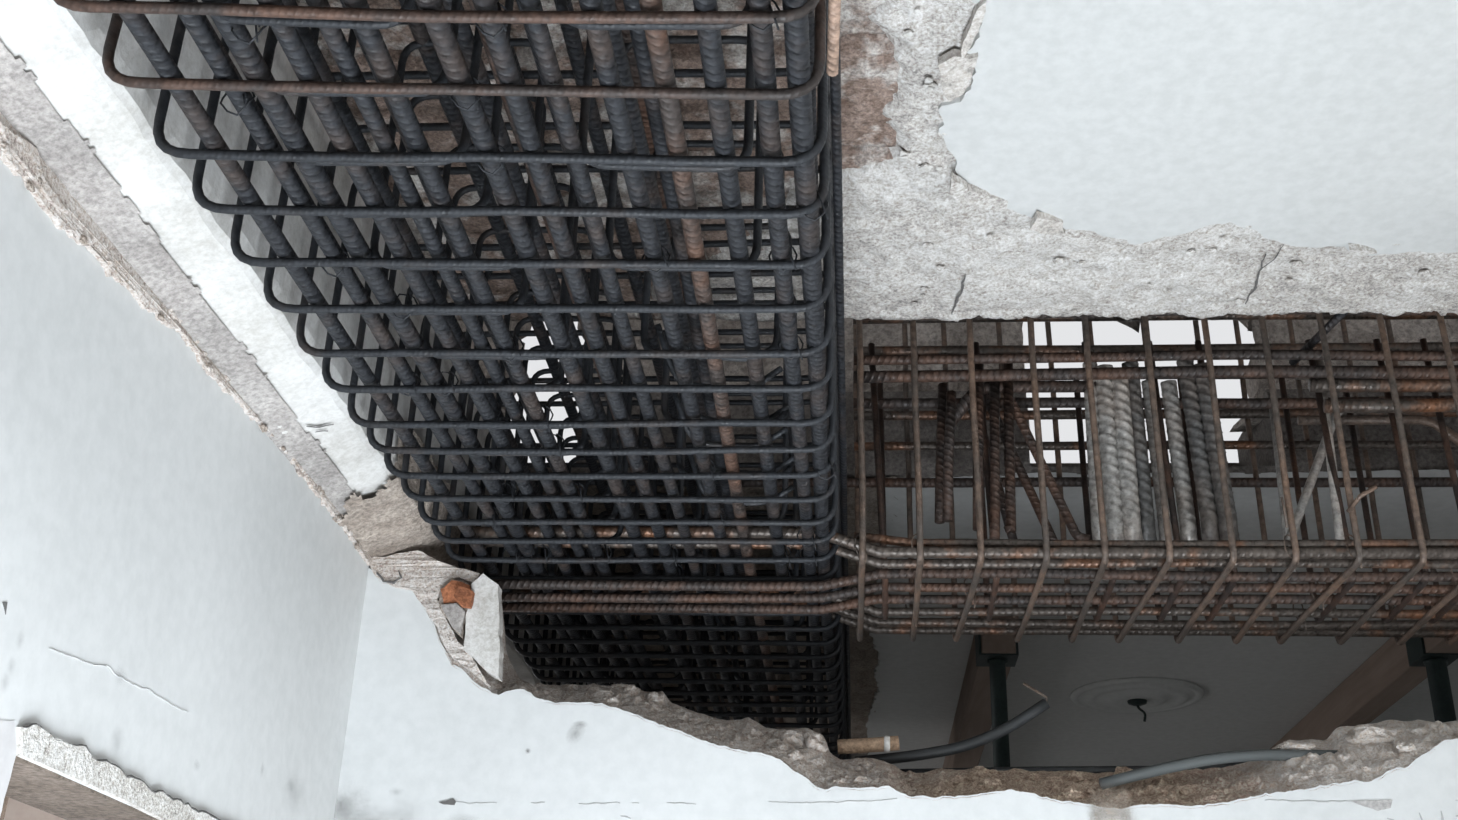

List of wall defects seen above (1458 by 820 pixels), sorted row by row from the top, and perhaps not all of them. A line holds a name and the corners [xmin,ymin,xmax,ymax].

flaking render [367,0,544,322]
flaking render [499,0,662,320]
flaking render [662,0,694,11]
flaking render [667,0,805,322]
spalling [840,0,1458,322]
spalling [0,27,497,687]
spalling [5,723,220,820]
spalling [530,479,711,573]
spalling [742,487,818,573]
spalling [764,476,898,754]